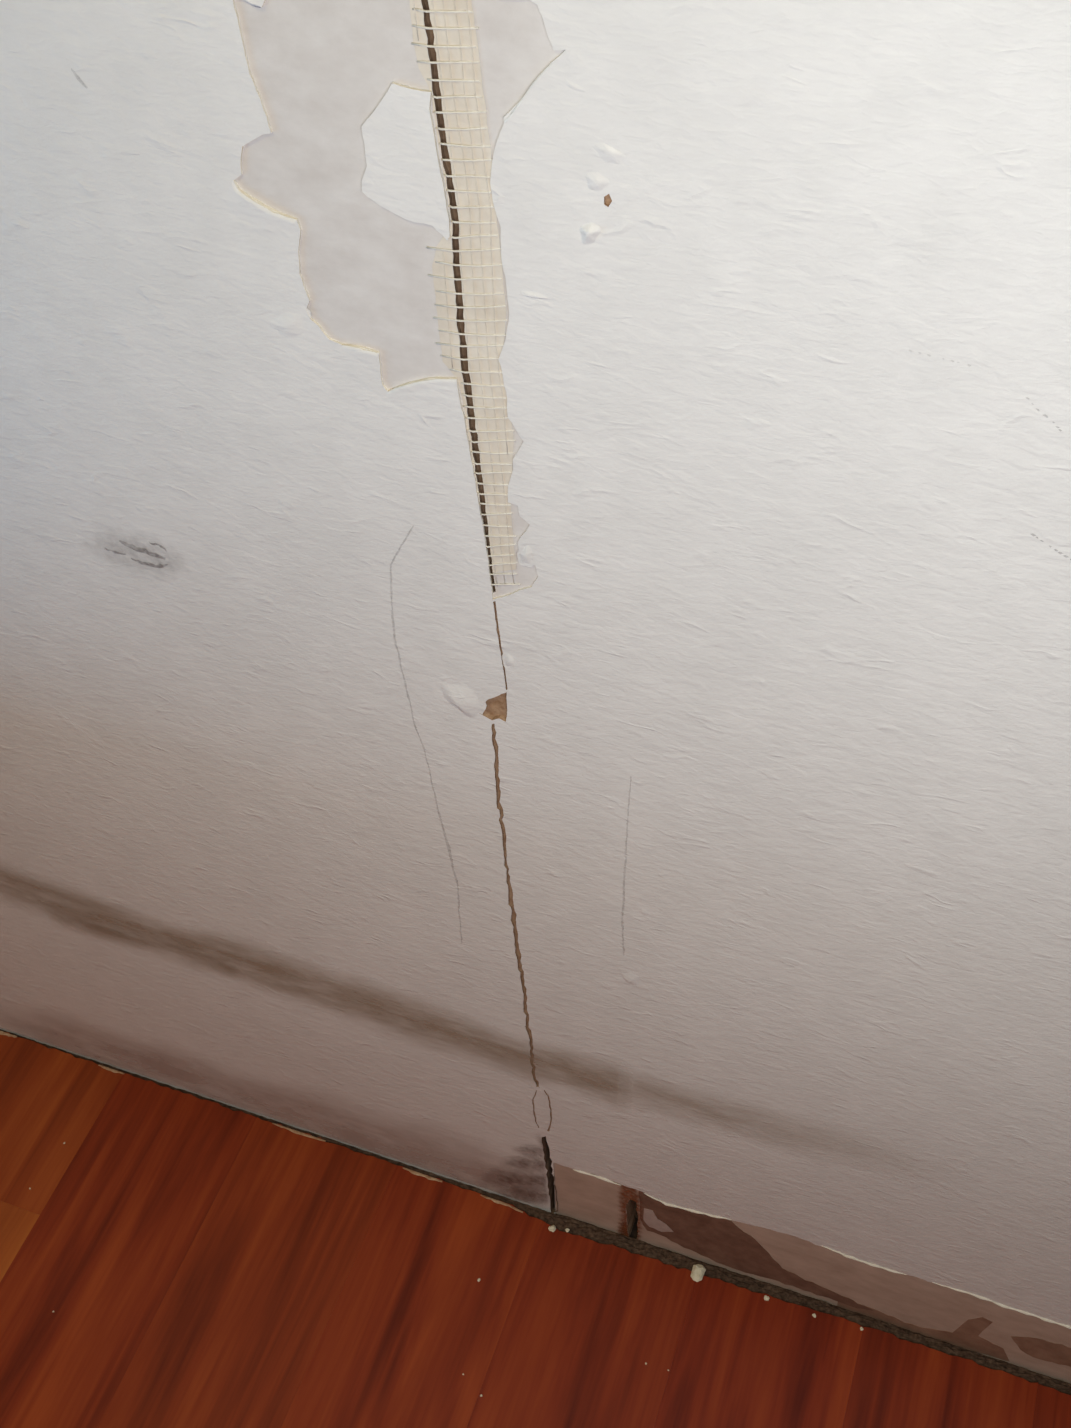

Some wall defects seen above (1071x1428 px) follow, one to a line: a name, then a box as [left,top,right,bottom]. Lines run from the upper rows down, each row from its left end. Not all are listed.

peeling [223,0,538,599]
crack [421,0,508,690]
peeling [472,0,565,158]
crack [491,724,558,1213]